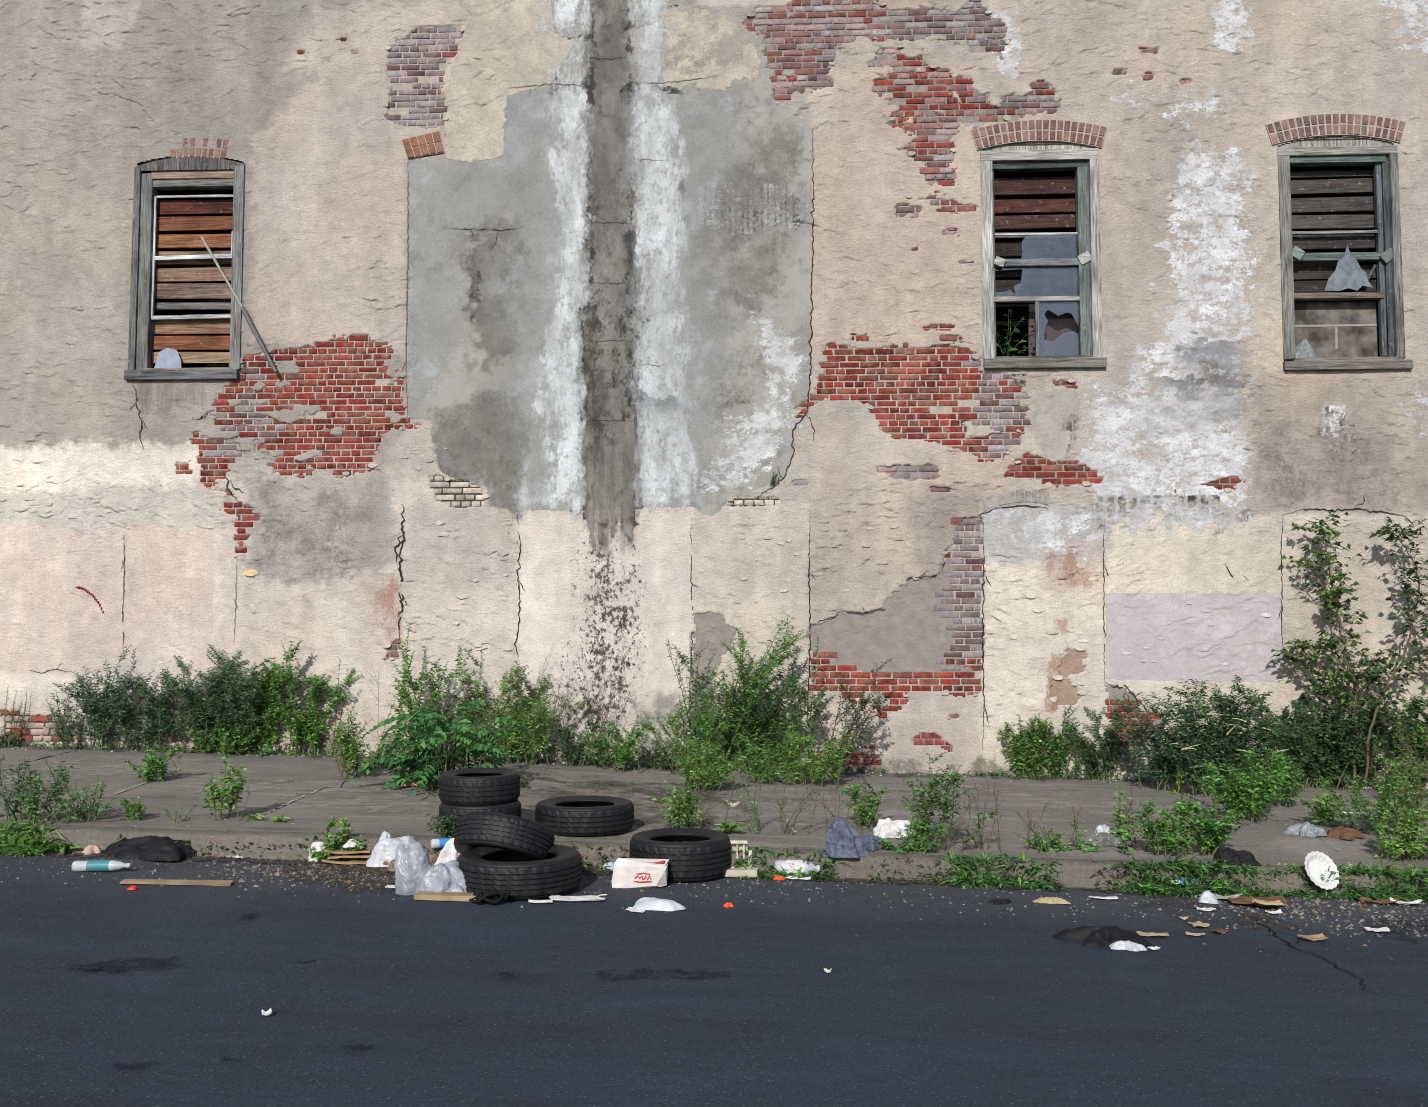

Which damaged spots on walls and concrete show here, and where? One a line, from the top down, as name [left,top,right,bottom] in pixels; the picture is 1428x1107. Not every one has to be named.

spalling [382,26,464,129]
spalling [742,0,1061,237]
water stain [985,80,1262,565]
spalling [175,335,422,576]
water stain [434,0,814,828]
spalling [877,463,950,493]
spalling [794,324,1103,488]
crack [394,504,407,639]
spalling [806,517,986,718]
spalling [0,710,75,743]
water stain [196,780,436,812]
spalling [913,730,952,752]